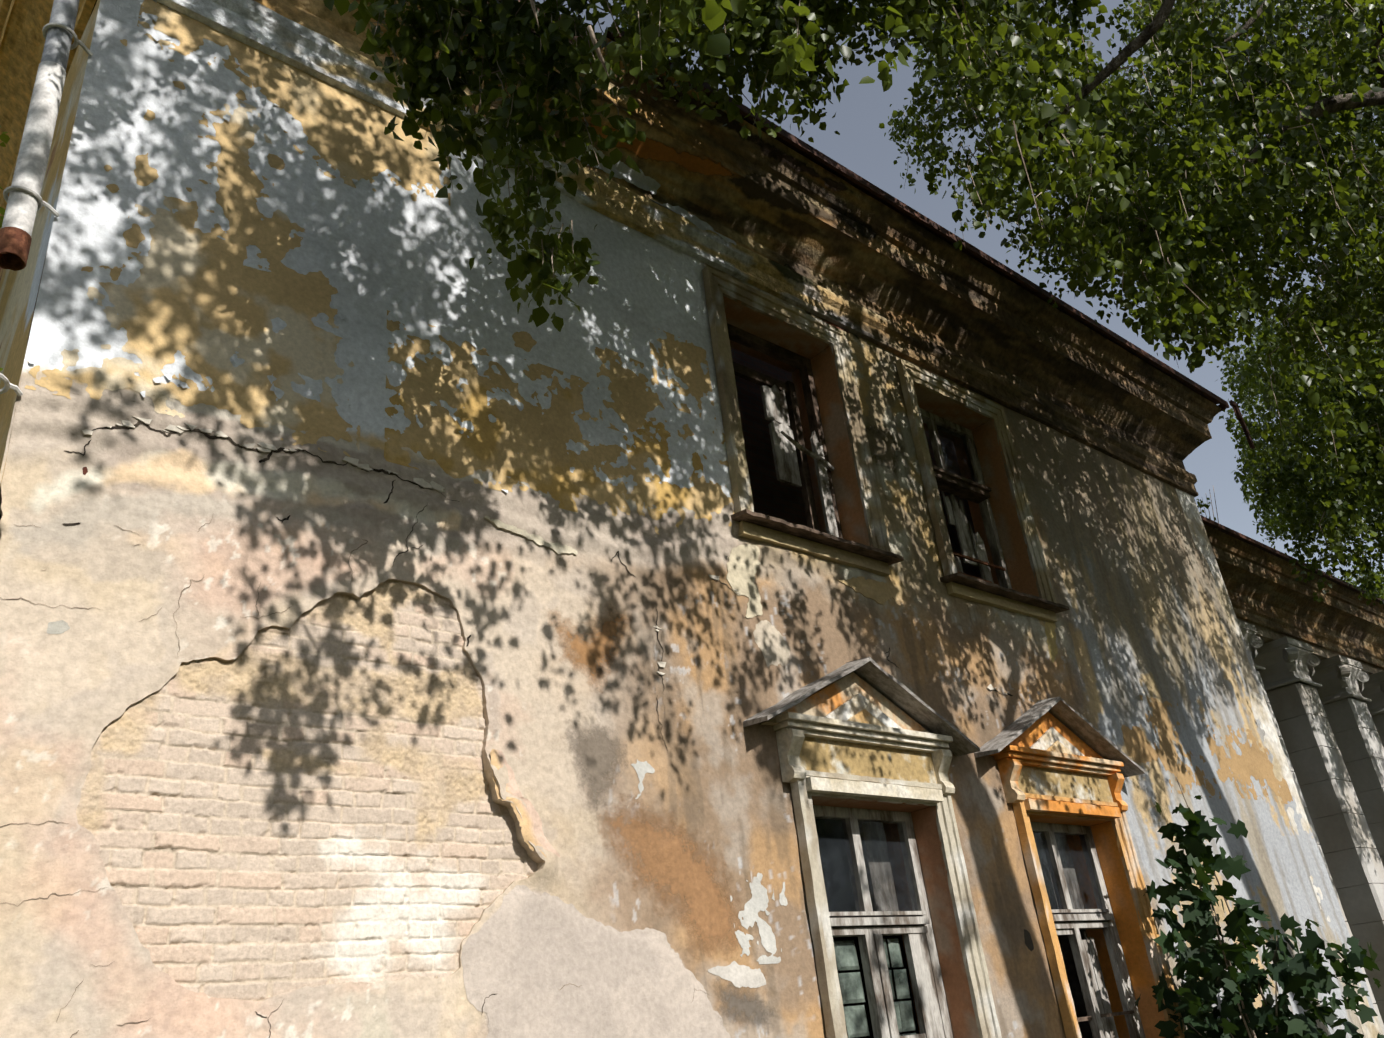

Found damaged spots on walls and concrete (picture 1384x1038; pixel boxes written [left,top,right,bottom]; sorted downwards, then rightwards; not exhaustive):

peeling [25,0,450,457]
damp [769,260,818,286]
damp [730,173,878,239]
crack [14,521,80,529]
crack [66,416,459,585]
peeling [484,516,578,555]
peeling [384,310,735,534]
damp [865,426,903,472]
peeling [726,544,790,667]
flaking render [76,580,560,1001]
peeling [708,873,788,988]